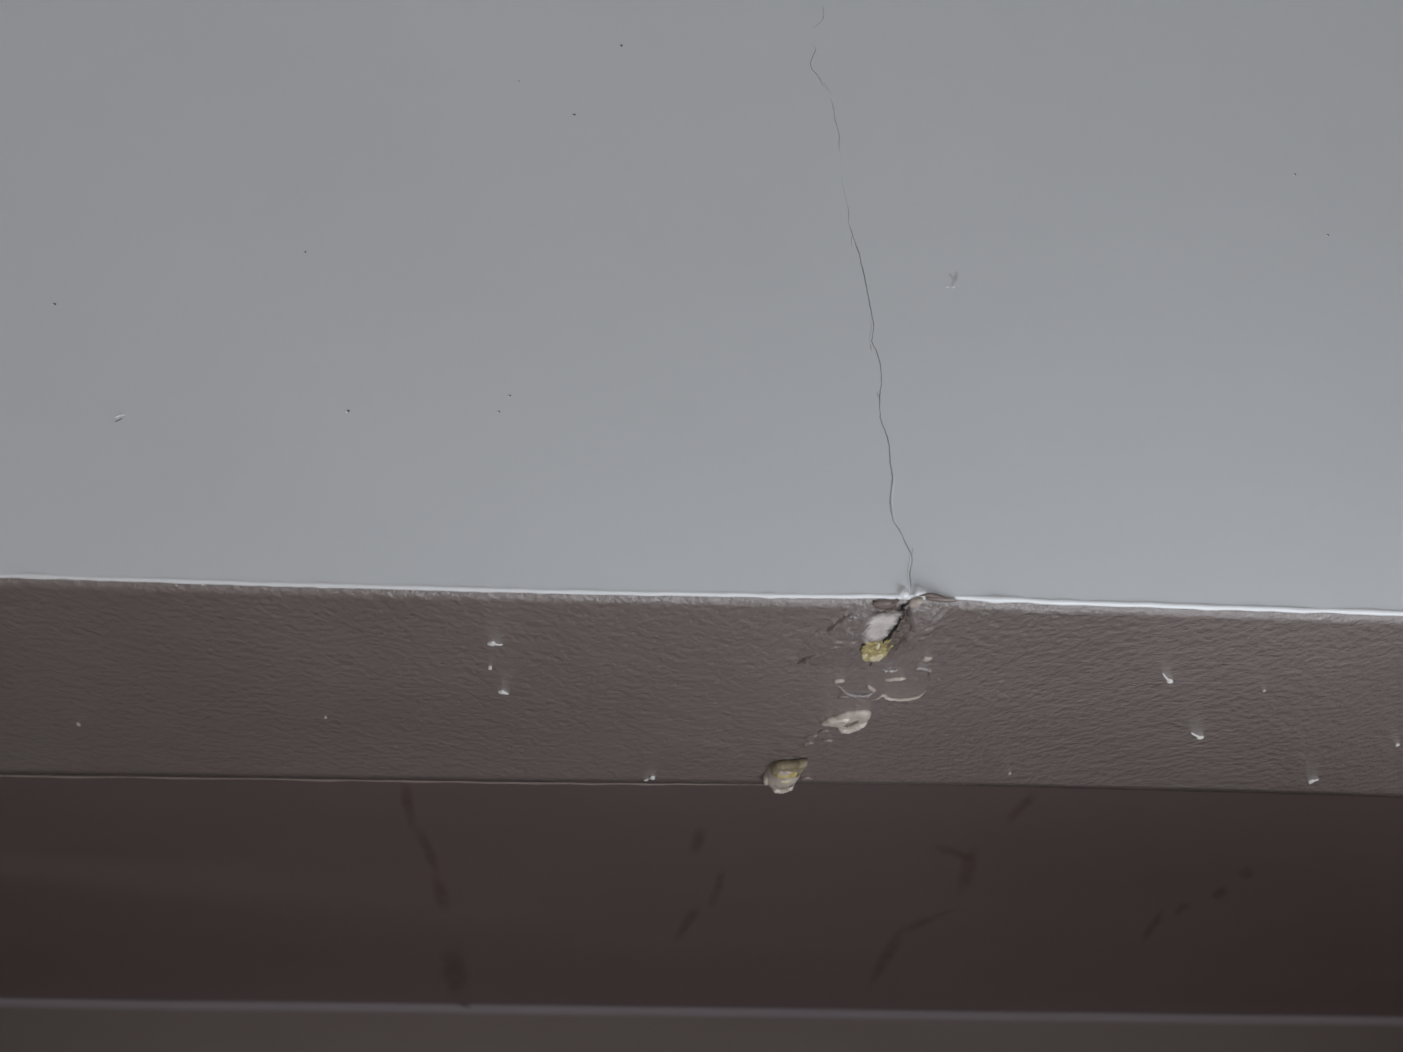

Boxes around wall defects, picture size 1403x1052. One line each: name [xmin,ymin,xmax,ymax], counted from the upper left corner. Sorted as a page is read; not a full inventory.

crack [809,3,913,592]
flaking render [797,586,957,669]
peeling [803,709,872,746]